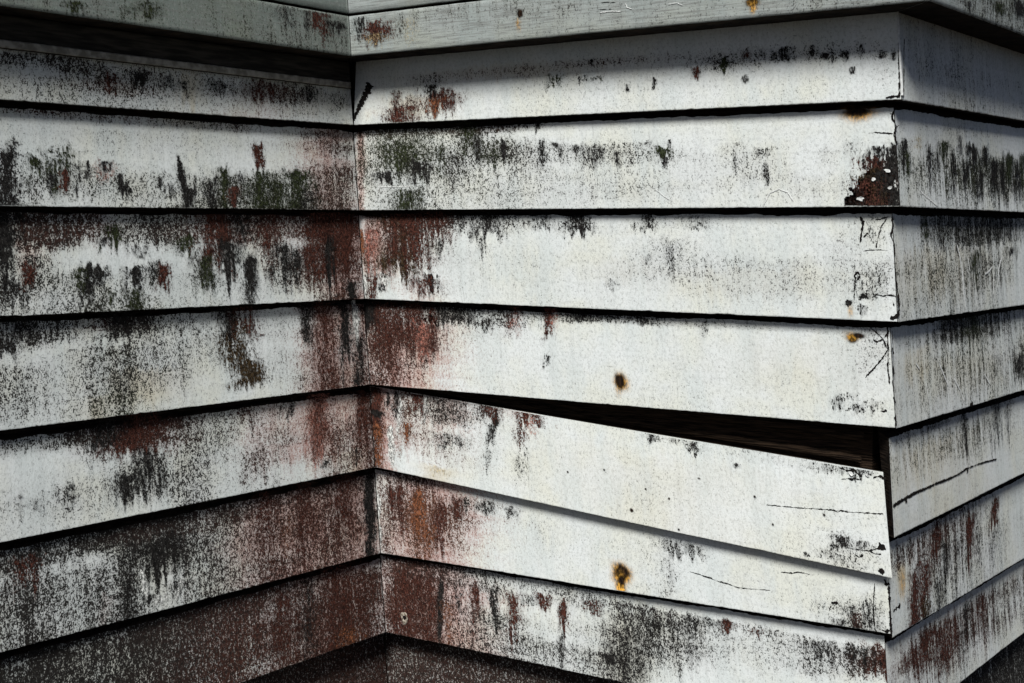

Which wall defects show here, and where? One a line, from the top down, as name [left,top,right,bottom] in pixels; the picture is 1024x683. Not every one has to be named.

corrosion [380,84,467,123]
water stain [535,117,622,170]
water stain [639,139,674,168]
water stain [0,137,133,360]
water stain [898,135,1024,294]
water stain [67,121,537,673]
corrosion [615,375,627,388]
crack [771,216,997,635]
corrosion [988,496,999,558]
corrosion [613,564,631,591]
corrosion [906,558,934,626]
water stain [581,599,764,683]